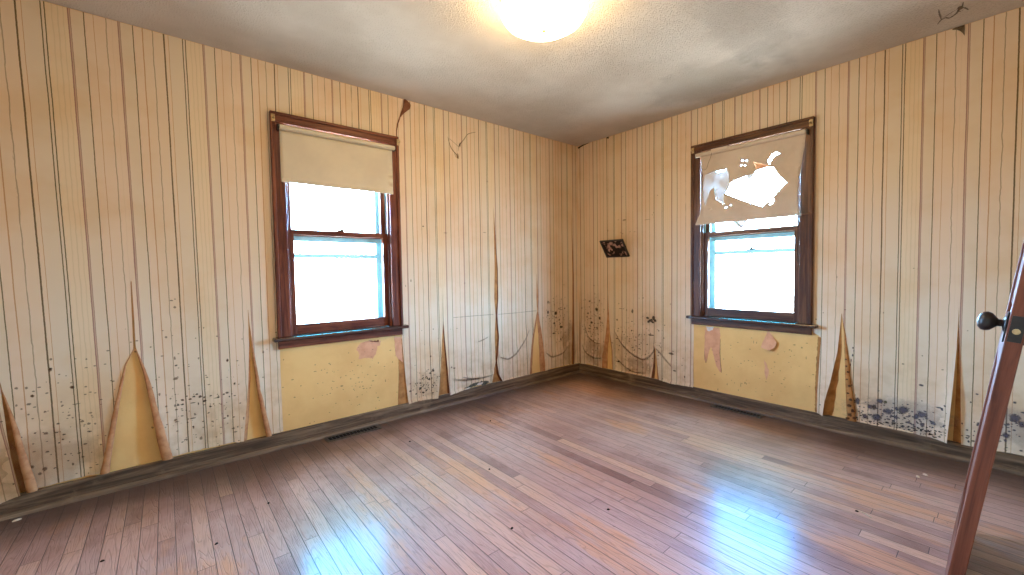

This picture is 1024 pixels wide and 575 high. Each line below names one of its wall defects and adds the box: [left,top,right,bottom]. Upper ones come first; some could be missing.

crack [938,2,969,24]
flaking render [0,386,26,492]
water stain [15,358,106,474]
flaking render [110,287,161,470]
water stain [152,353,244,450]
flaking render [247,317,266,440]
flaking render [492,226,500,383]
water stain [611,303,674,371]
flaking render [832,321,847,418]
water stain [845,347,947,438]
flaking render [947,332,958,441]
water stain [1000,402,1024,451]